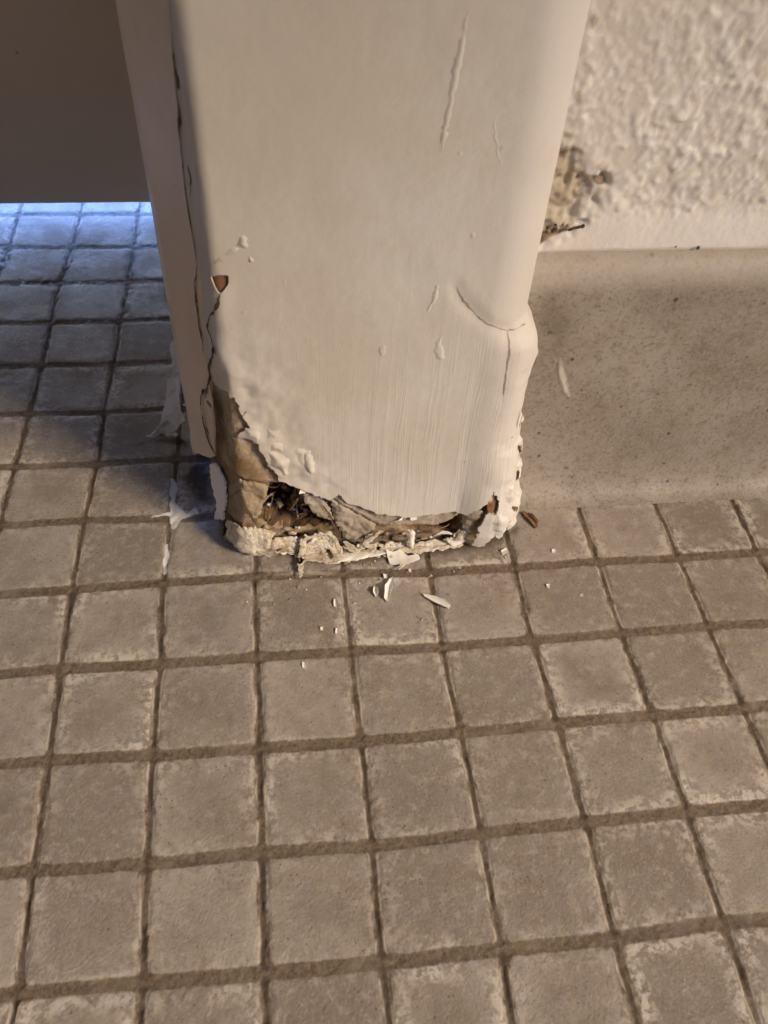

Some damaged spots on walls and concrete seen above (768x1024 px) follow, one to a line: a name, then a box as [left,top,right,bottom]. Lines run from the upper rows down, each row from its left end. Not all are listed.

crack [169,4,222,455]
peeling [213,275,229,292]
flaking render [540,149,604,243]
crack [456,287,525,400]
spalling [209,382,524,579]